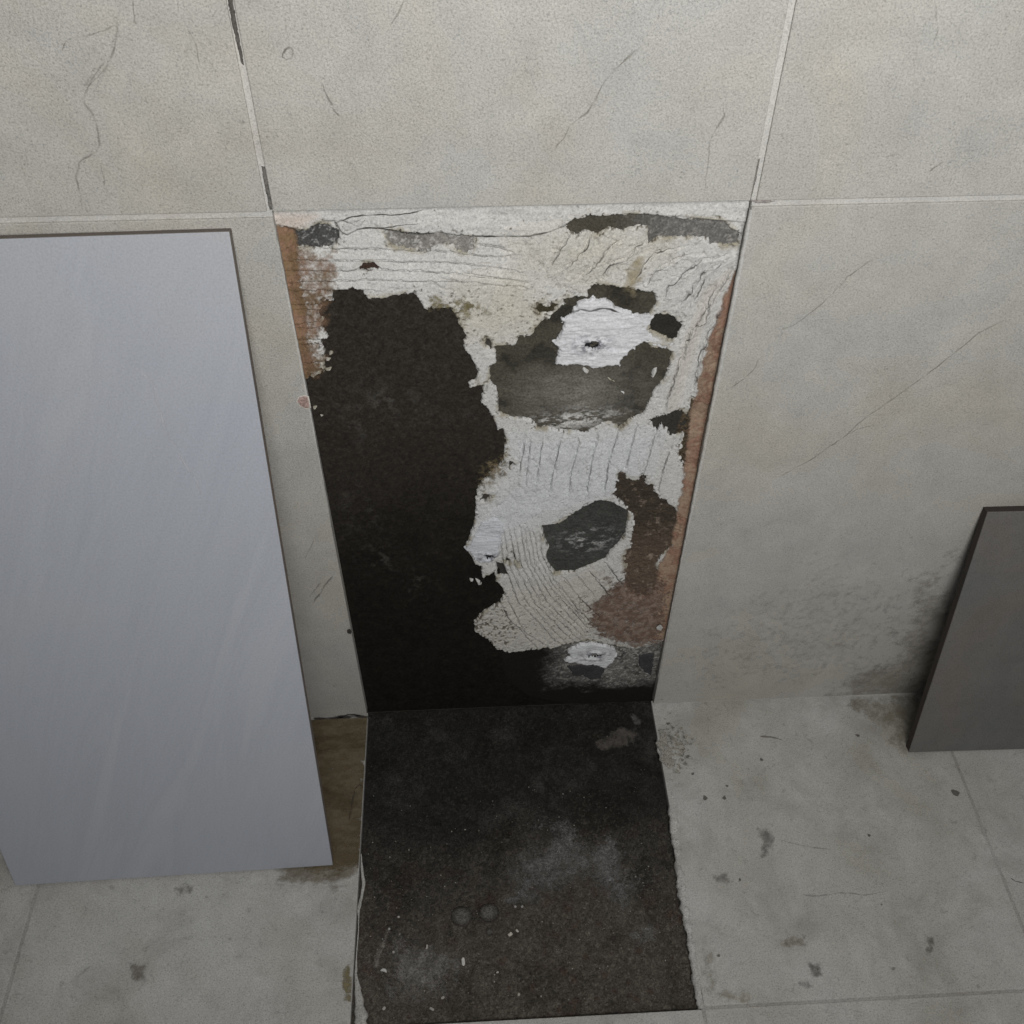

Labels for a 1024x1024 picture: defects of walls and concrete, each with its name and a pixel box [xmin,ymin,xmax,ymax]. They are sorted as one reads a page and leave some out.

spalling [293,223,339,247]
spalling [383,230,474,252]
spalling [565,213,739,244]
spalling [488,284,691,436]
peeling [296,395,323,416]
spalling [542,470,677,595]
spalling [500,625,663,704]